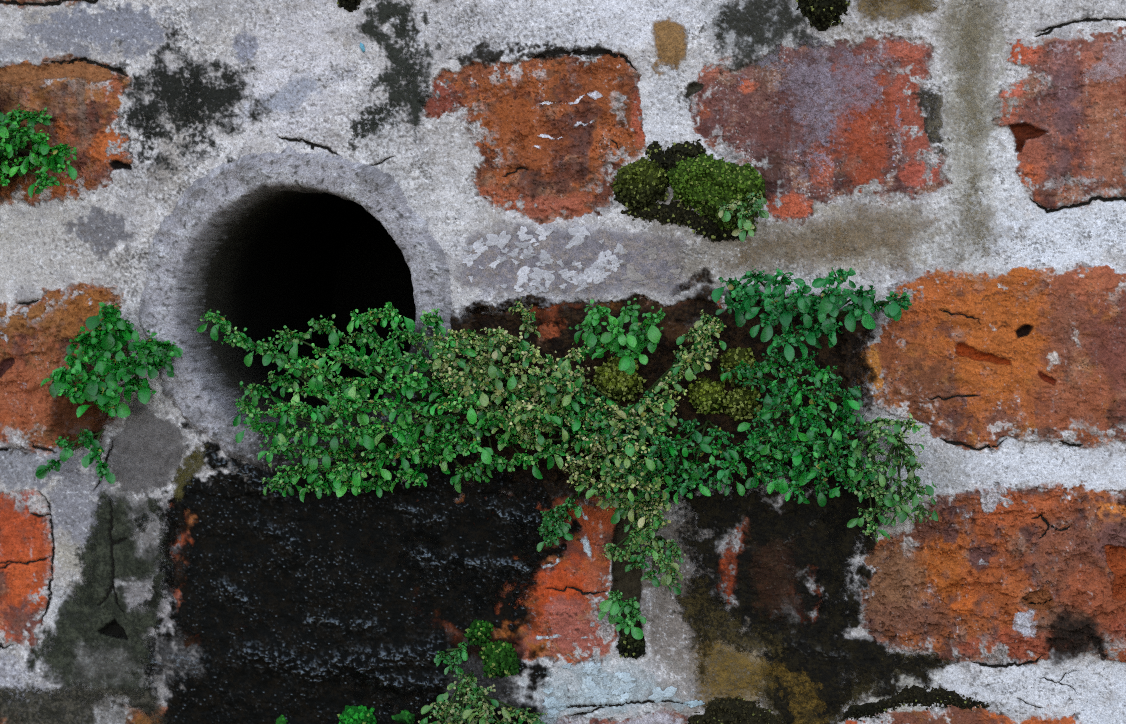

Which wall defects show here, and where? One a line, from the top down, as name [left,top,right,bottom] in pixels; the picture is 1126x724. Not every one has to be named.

leakage [115,28,272,171]
leakage [349,0,441,150]
spalling [686,82,703,97]
crack [1035,18,1126,37]
leakage [27,628,56,671]
leakage [50,392,591,724]
leakage [626,713,680,724]
leakage [669,469,959,724]